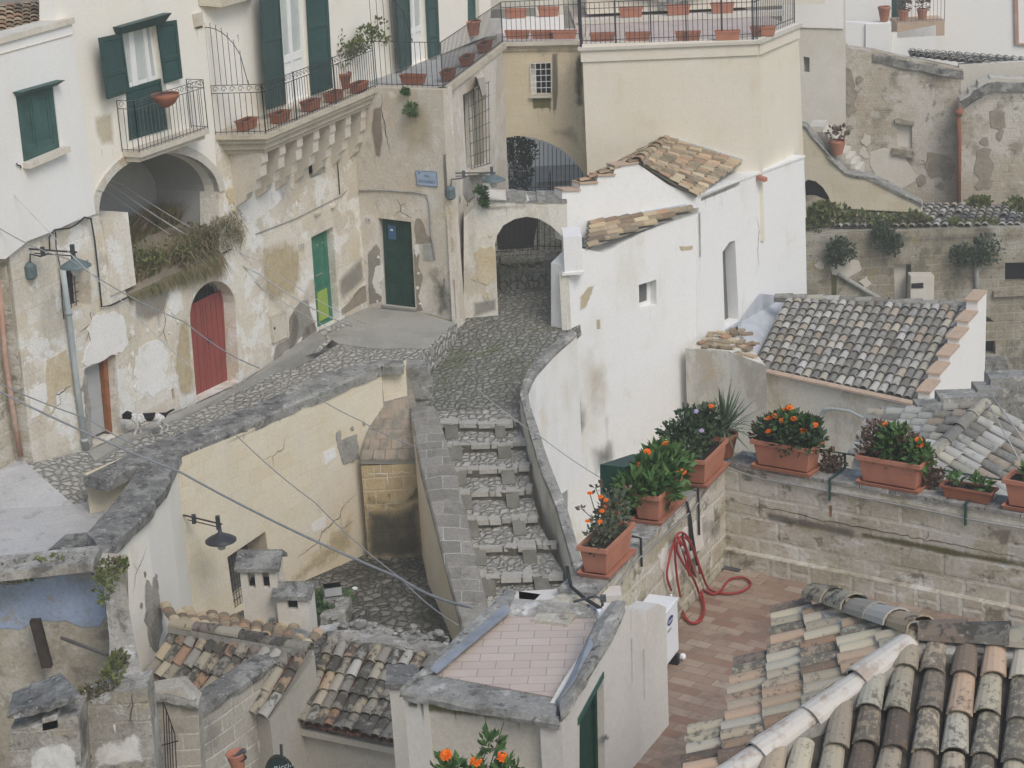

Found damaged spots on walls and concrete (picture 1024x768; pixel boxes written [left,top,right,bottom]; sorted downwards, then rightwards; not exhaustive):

peeling [226,181,298,225]
peeling [80,288,181,448]
crack [299,494,356,556]
crack [732,500,1022,559]